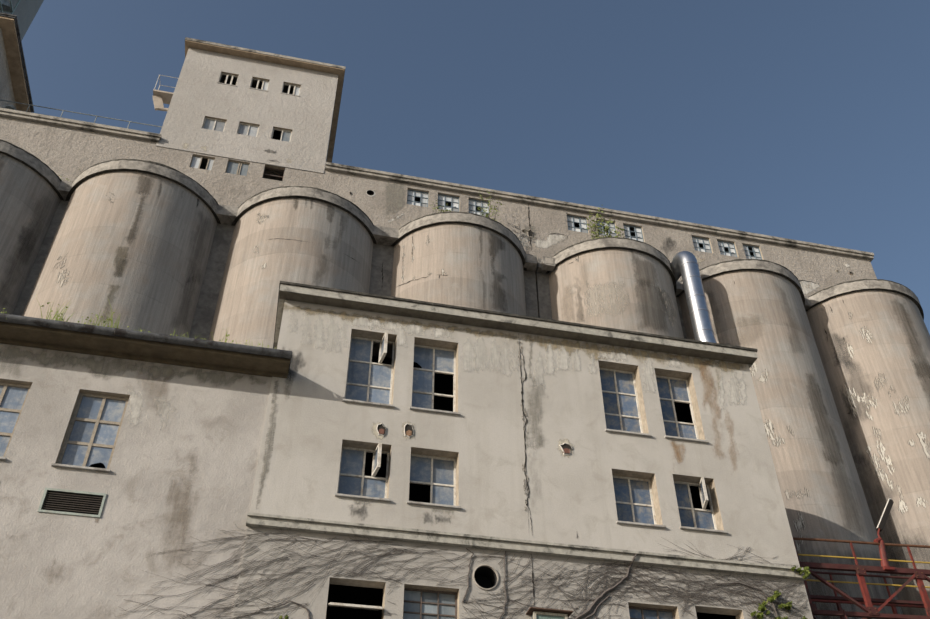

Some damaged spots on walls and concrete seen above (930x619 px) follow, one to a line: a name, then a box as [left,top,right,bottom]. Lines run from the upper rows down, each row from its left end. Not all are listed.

water stain [0,347,258,385]
water stain [260,413,275,491]
water stain [285,306,746,445]
crack [517,333,535,602]
spalling [844,372,930,513]